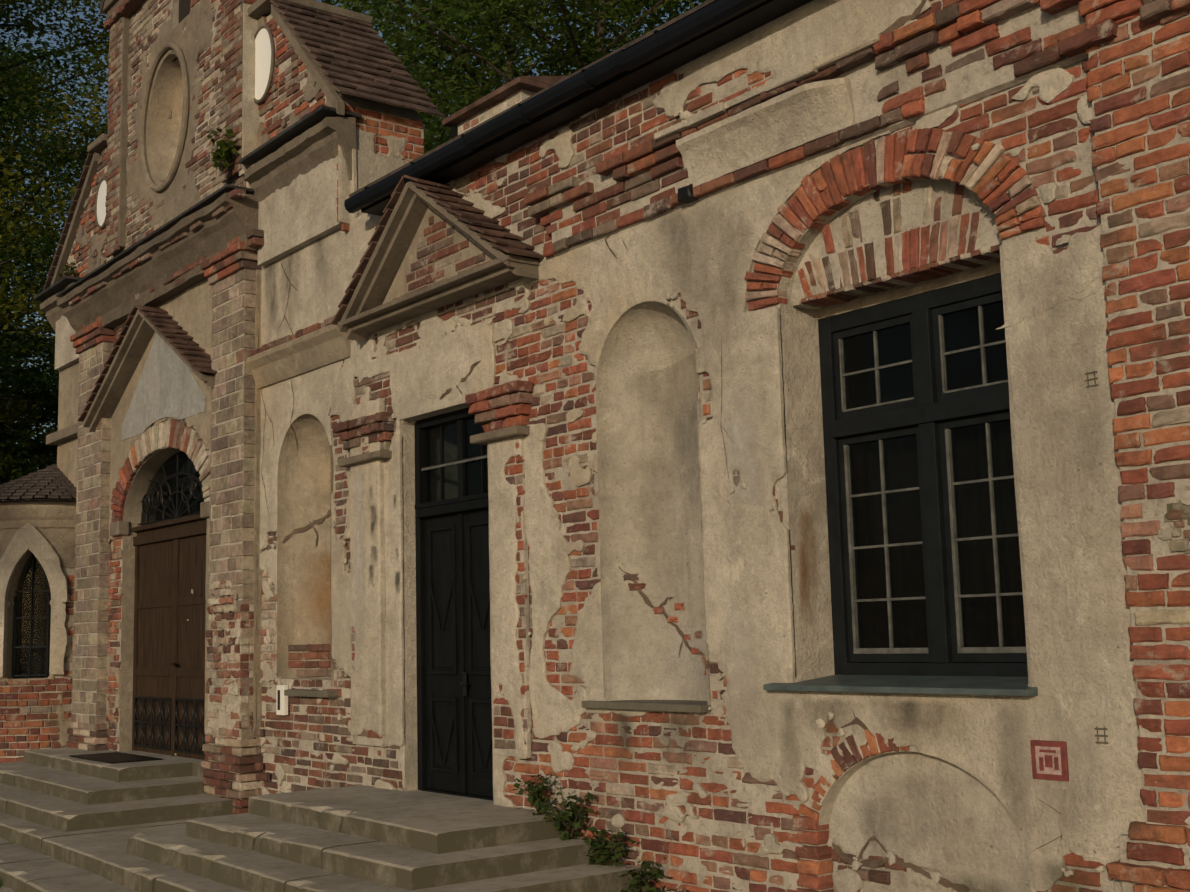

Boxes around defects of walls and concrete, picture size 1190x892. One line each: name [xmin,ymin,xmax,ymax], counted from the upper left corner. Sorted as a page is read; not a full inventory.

crack [880,0,926,34]
spalling [452,69,773,247]
spalling [931,62,1101,254]
crack [260,382,331,551]
spalling [354,372,396,437]
spalling [374,278,601,700]
spalling [0,575,75,763]
spalling [205,571,403,794]
spalling [503,662,806,892]
crack [619,567,709,675]
spalling [815,712,846,755]
spalling [827,837,907,892]